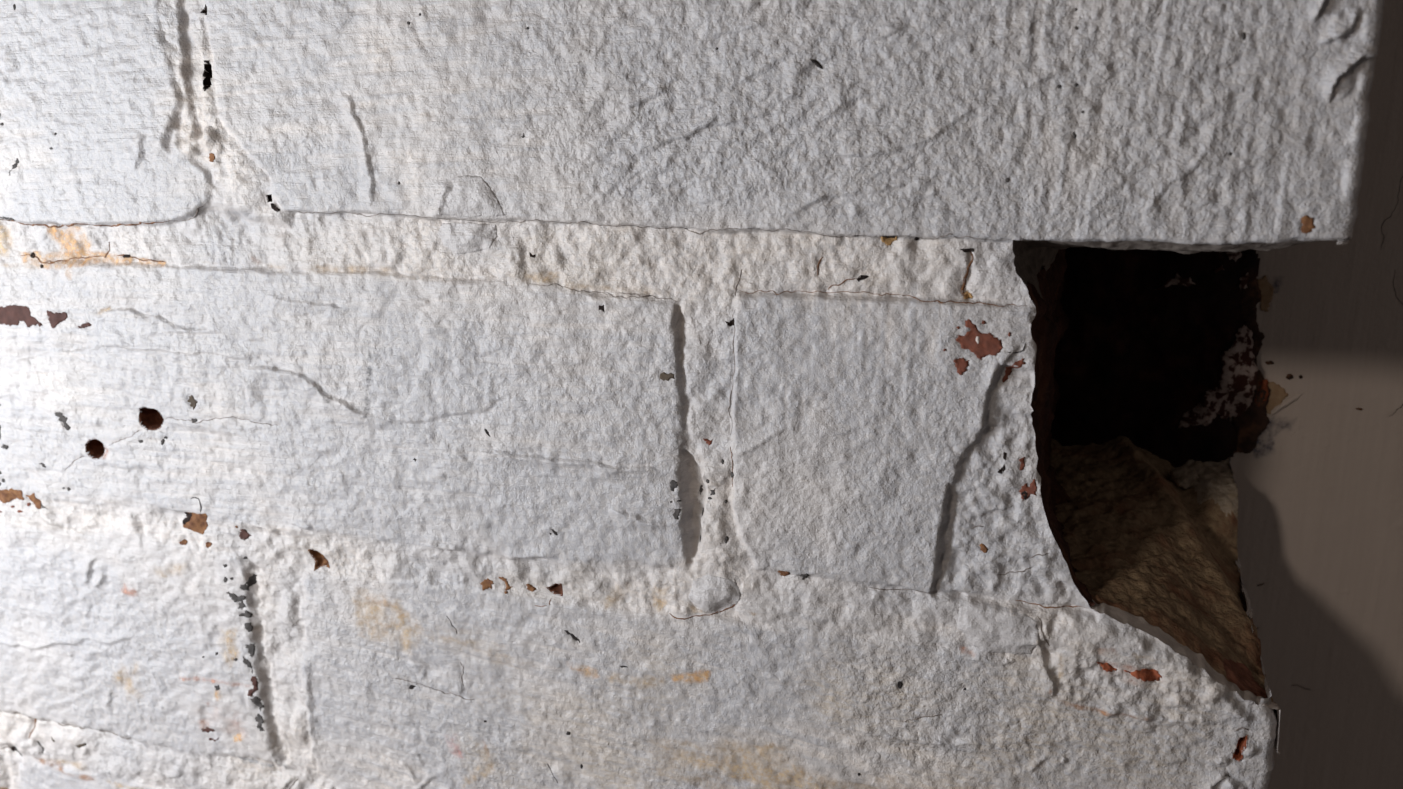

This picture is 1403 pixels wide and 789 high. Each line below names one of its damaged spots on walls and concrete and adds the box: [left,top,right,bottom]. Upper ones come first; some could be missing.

peeling [0,305,91,328]
spalling [943,215,1318,754]